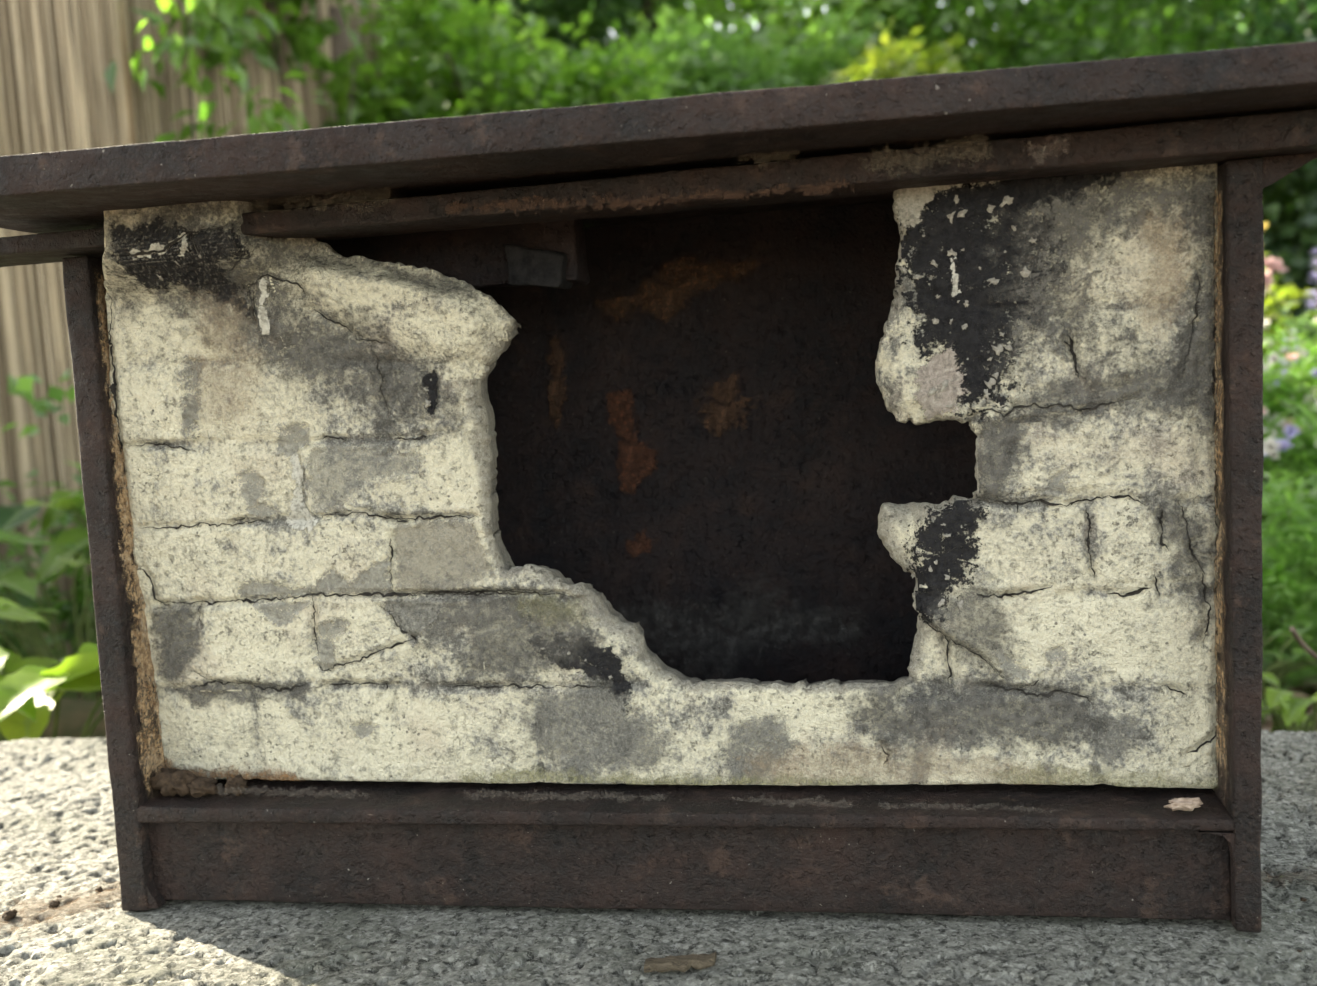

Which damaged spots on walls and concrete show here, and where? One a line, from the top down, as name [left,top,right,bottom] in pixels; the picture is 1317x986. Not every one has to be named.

corrosion [444,179,861,216]
leakage [130,232,188,258]
peeling [899,248,965,280]
leakage [950,257,961,297]
spalling [913,331,1013,421]
corrosion [606,389,658,494]
crack [975,208,1219,767]